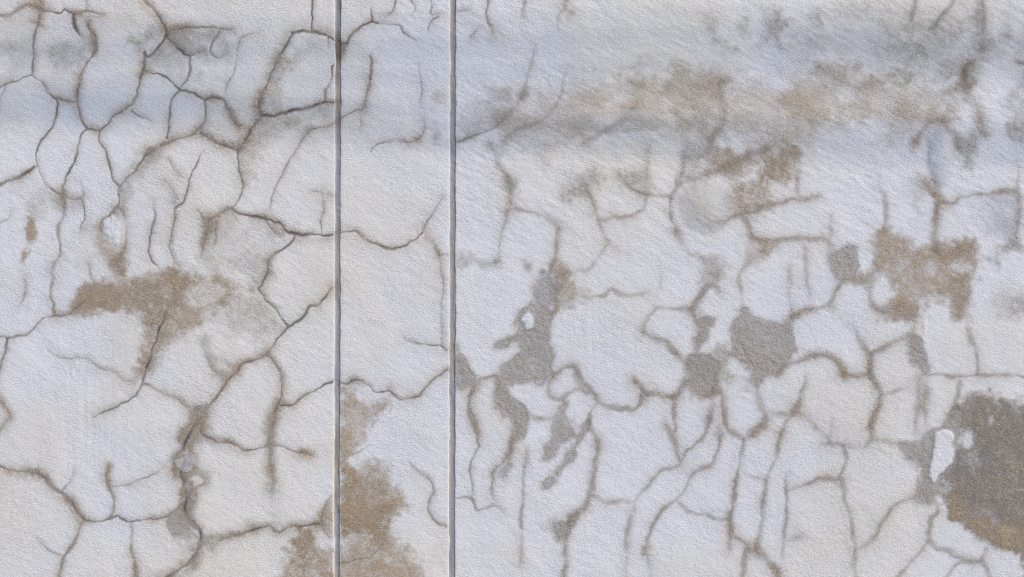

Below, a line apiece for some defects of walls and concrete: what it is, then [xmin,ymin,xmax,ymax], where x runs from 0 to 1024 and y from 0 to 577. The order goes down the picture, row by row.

damp [683,89,822,208]
damp [72,216,233,374]
crack [0,0,448,577]
peeling [494,270,558,439]
peeling [685,317,719,394]
peeling [730,308,797,383]
damp [853,227,977,321]
damp [340,464,417,577]
crack [468,374,499,510]
crack [537,365,803,519]
crack [729,466,788,577]
damp [942,389,1024,560]